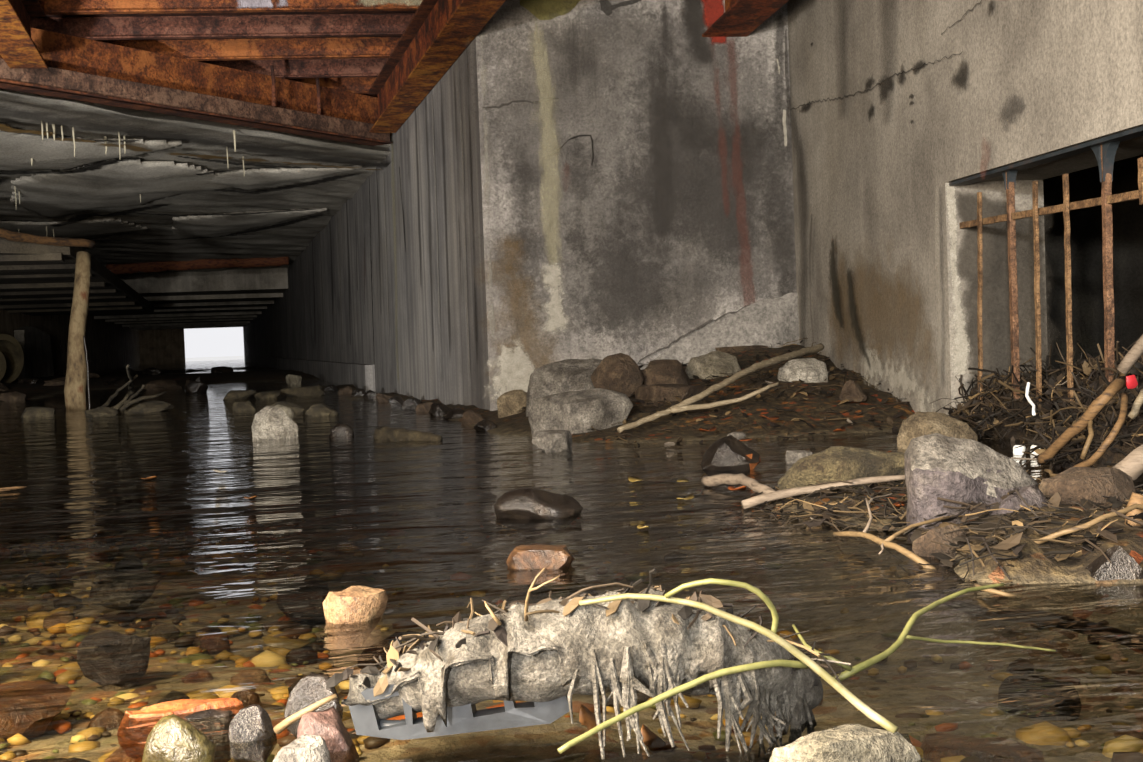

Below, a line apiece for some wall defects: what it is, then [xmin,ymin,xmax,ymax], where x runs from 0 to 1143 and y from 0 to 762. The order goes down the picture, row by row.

damp [682,0,712,63]
corrosion [701,0,726,43]
crack [790,0,982,110]
corrosion [0,124,151,152]
damp [543,263,568,333]